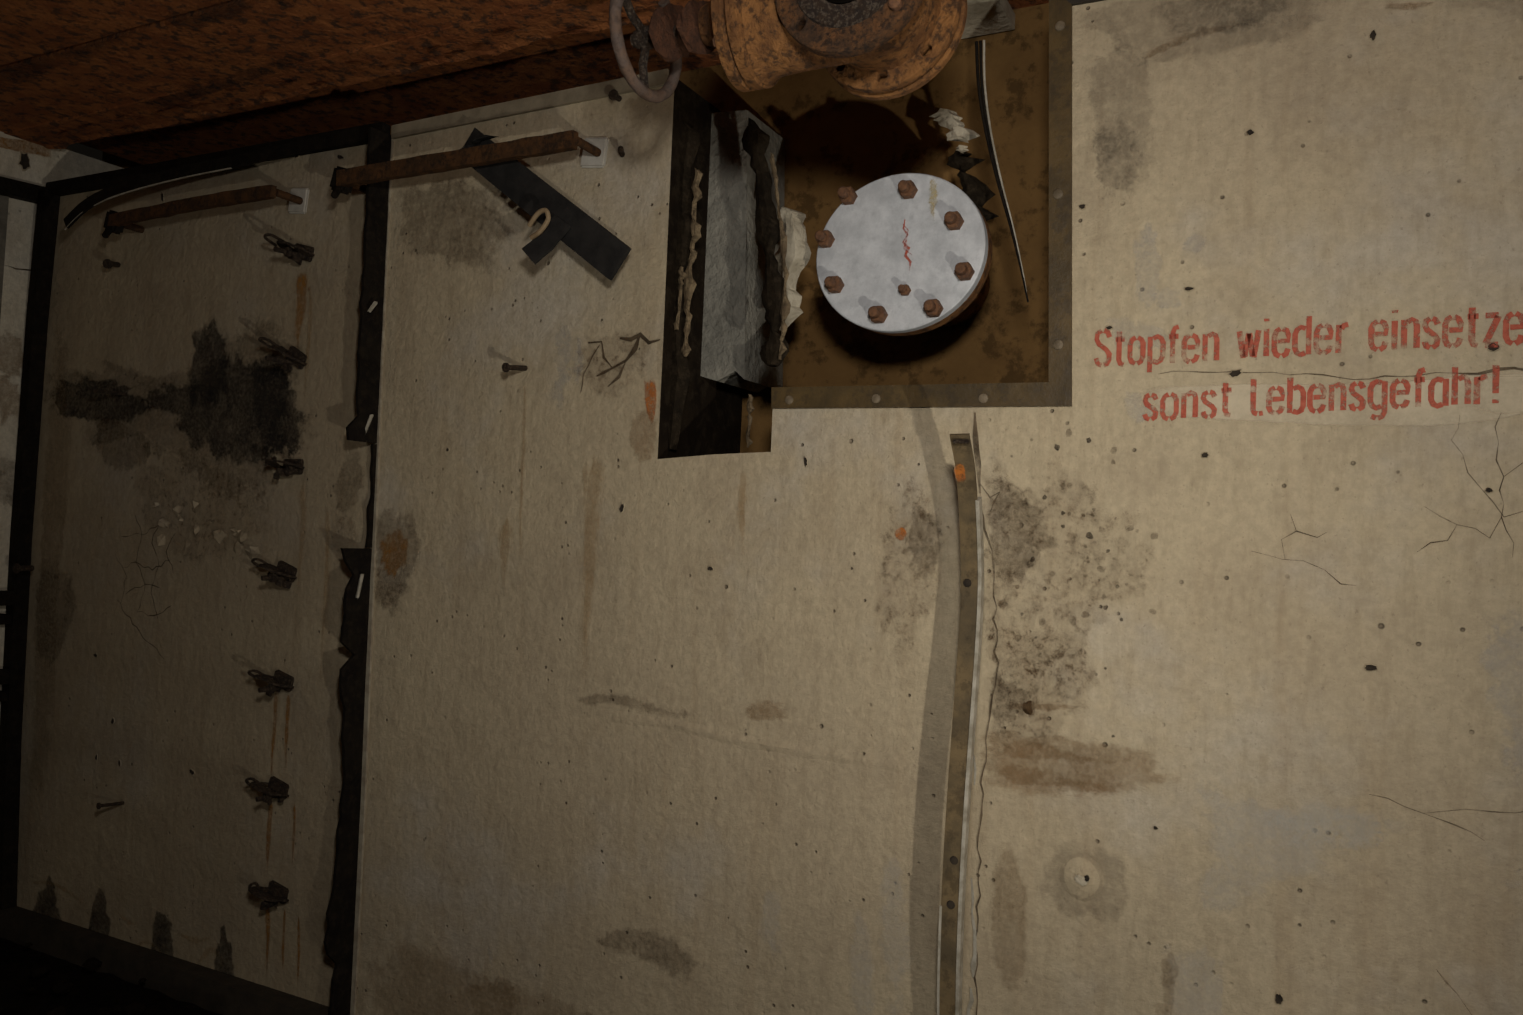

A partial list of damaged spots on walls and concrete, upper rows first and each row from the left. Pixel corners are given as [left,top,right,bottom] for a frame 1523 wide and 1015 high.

leakage [55,322,304,534]
crack [1252,514,1348,585]
crack [1160,367,1523,380]
crack [1419,412,1523,557]
crack [973,412,1000,1015]